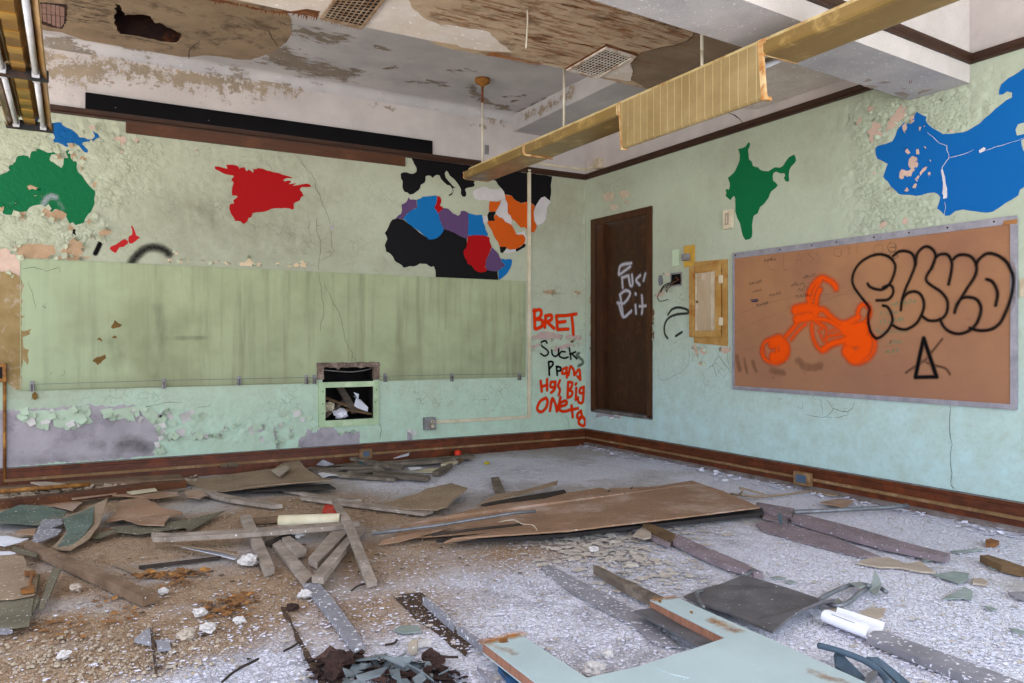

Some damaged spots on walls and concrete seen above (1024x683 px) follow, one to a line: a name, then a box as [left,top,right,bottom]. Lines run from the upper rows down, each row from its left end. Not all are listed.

flaking render [39,0,366,106]
flaking render [409,0,743,89]
peeling [854,79,933,144]
peeling [53,143,86,171]
peeling [899,146,931,193]
peeling [0,185,113,391]
crack [294,154,357,362]
peeling [0,392,360,468]
crack [947,405,955,488]